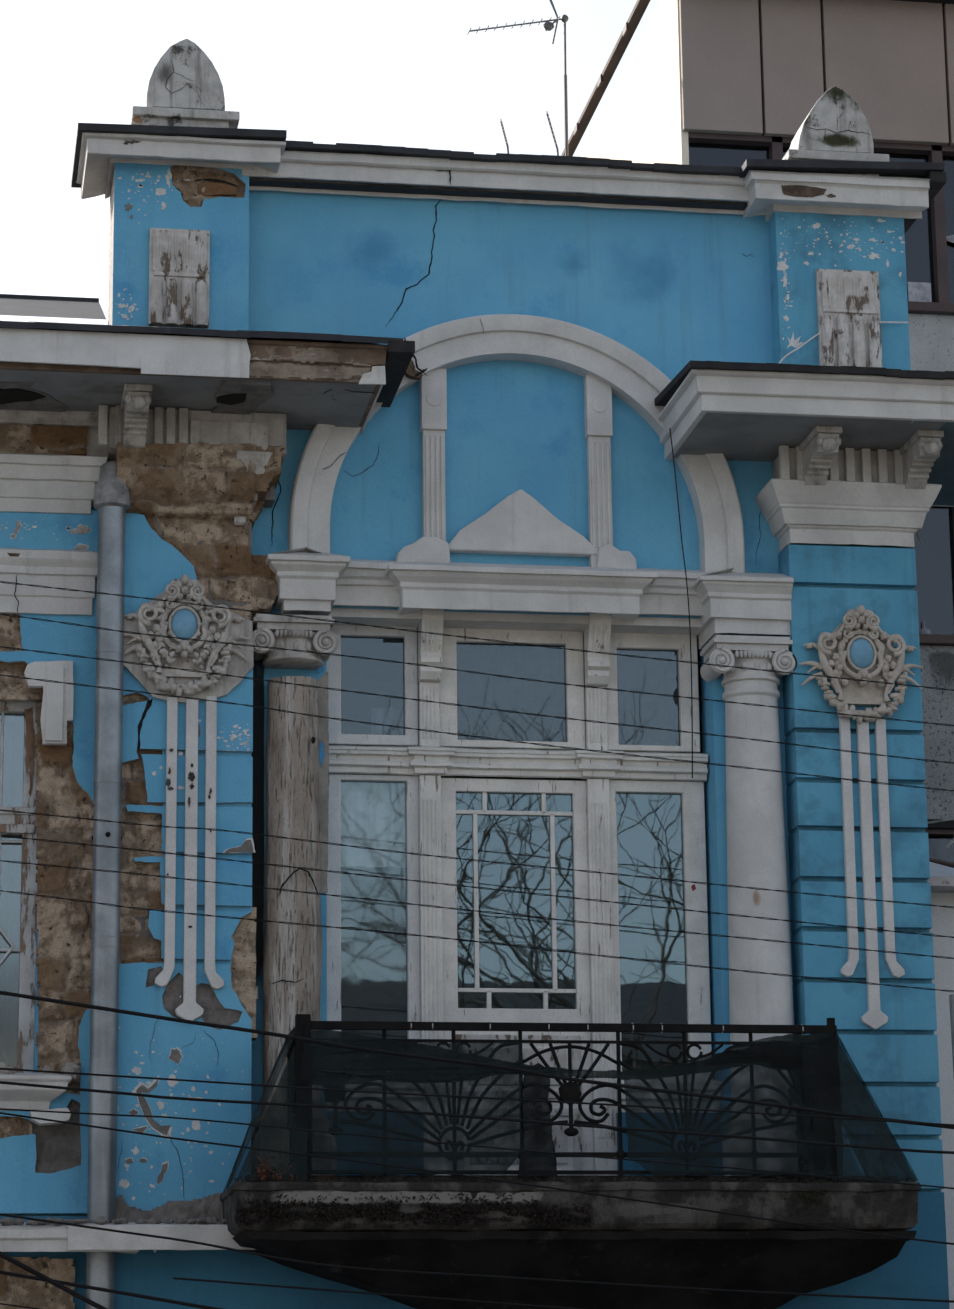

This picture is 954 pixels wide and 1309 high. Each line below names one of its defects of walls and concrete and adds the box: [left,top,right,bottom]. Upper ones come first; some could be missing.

spalling [117,165,245,223]
crack [388,170,451,323]
peeling [777,218,905,362]
flaking render [0,382,87,456]
flaking render [114,441,285,620]
crack [137,699,153,757]
flaking render [0,614,94,1173]
flaking render [119,694,258,1041]
spalling [116,1028,230,1222]
flaking render [0,1257,75,1309]